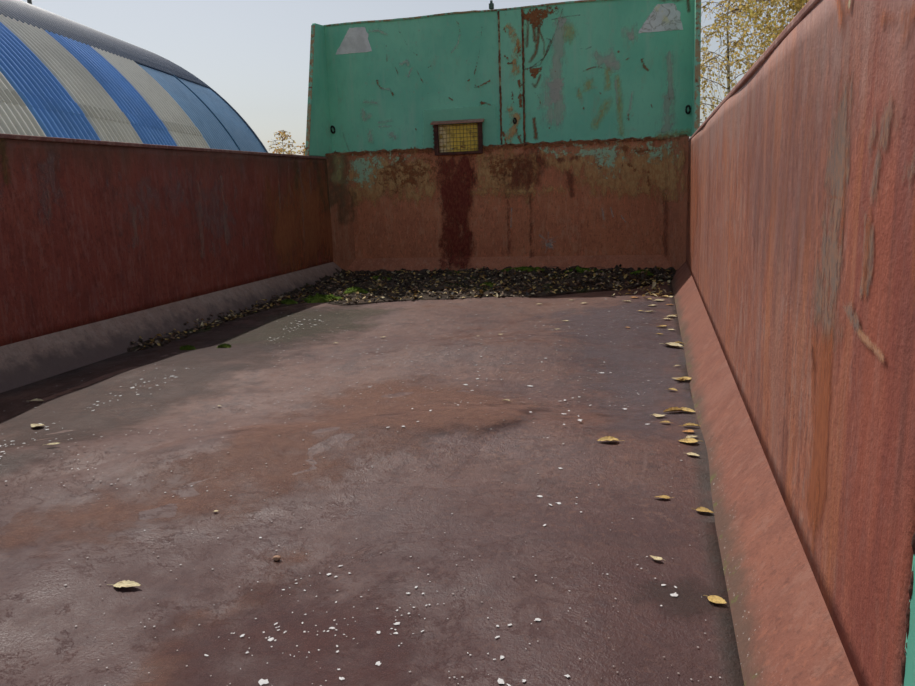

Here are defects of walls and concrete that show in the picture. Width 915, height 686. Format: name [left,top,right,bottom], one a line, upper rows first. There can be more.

peeling [339,150,441,206]
corrosion [325,147,477,269]
corrosion [483,5,700,259]
peeling [535,134,685,201]